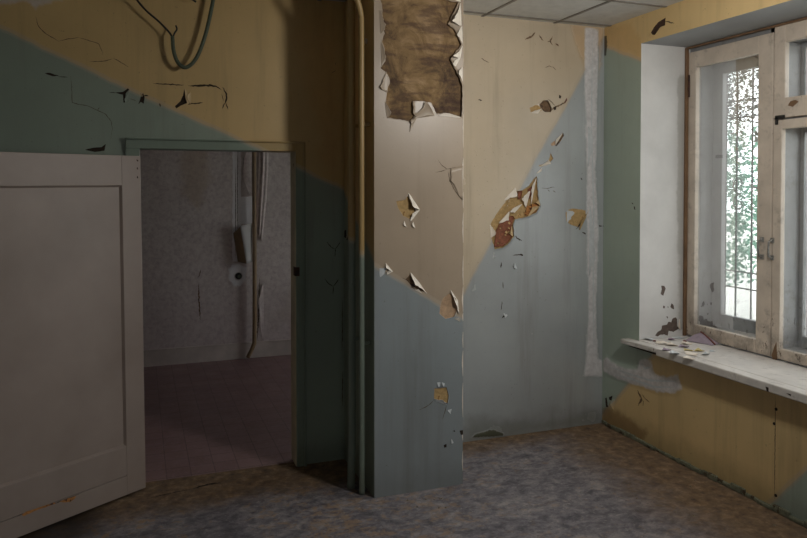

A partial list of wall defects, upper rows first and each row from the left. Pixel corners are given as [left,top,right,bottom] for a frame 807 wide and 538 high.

peeling [649,16,673,37]
spalling [378,0,464,148]
crack [153,83,228,109]
spalling [530,95,567,114]
peeling [489,133,564,258]
peeling [395,193,420,228]
peeling [566,209,588,230]
peeling [406,272,426,293]
peeling [438,291,463,321]
peeling [655,303,681,336]
peeling [686,331,719,345]